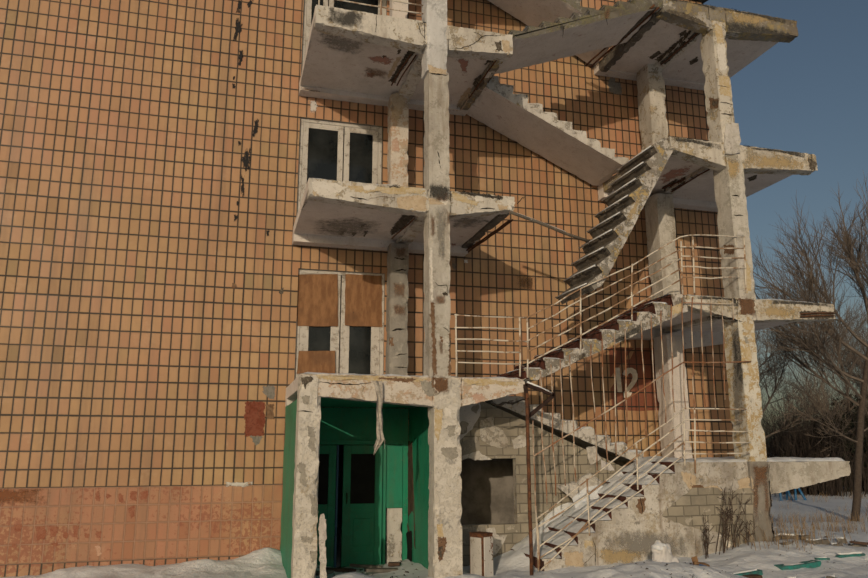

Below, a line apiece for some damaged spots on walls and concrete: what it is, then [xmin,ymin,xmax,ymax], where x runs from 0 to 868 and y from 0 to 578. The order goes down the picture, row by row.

water stain [329,7,362,27]
water stain [322,33,362,53]
spalling [371,49,417,86]
spalling [456,40,511,111]
peeling [585,4,731,109]
peeling [723,123,741,163]
peeling [299,248,452,412]
peeling [244,385,275,445]
peeling [434,378,531,461]
water stain [0,490,38,503]
spalling [437,524,448,562]
peeling [462,526,507,555]